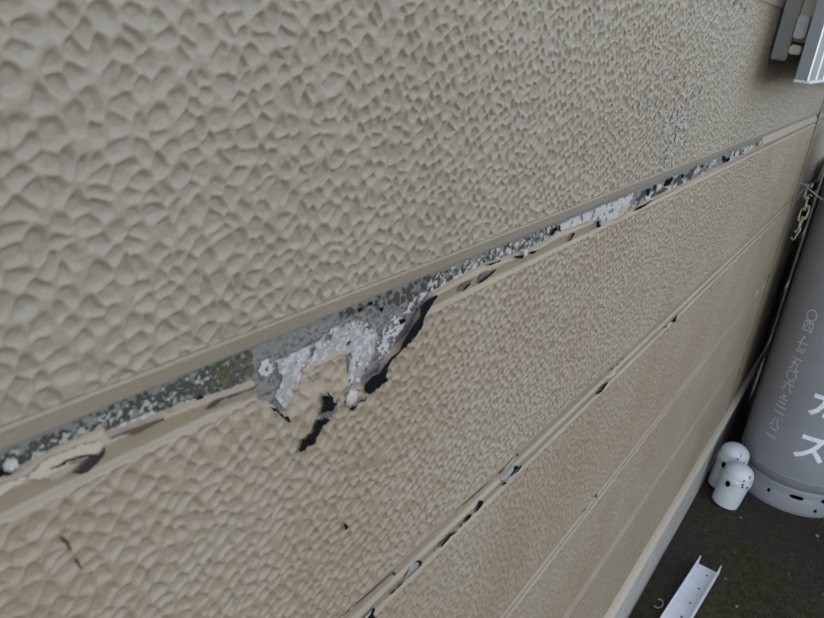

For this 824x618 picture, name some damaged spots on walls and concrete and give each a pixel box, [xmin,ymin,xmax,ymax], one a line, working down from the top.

spalling [0,137,763,496]